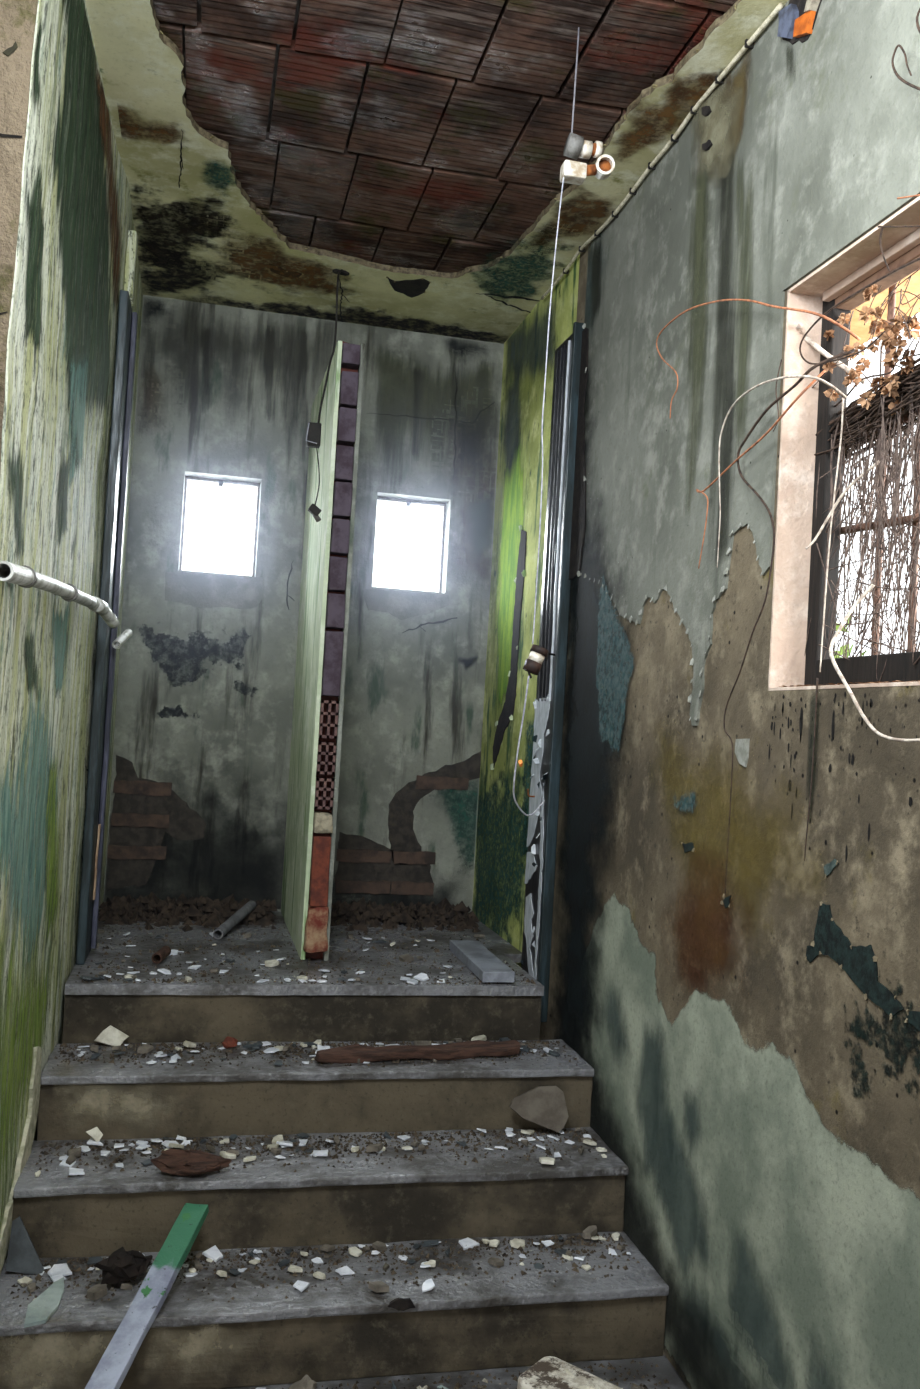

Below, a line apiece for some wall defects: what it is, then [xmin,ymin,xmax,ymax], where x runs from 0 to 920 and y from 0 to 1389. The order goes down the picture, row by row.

damp [34,20,42,112]
damp [25,167,44,350]
damp [97,71,520,580]
damp [533,188,611,316]
damp [8,450,24,558]
flaking render [335,525,527,896]
peeling [735,739,750,767]
flaking render [107,755,206,892]
damp [555,510,920,1389]
flaking render [803,901,920,1031]